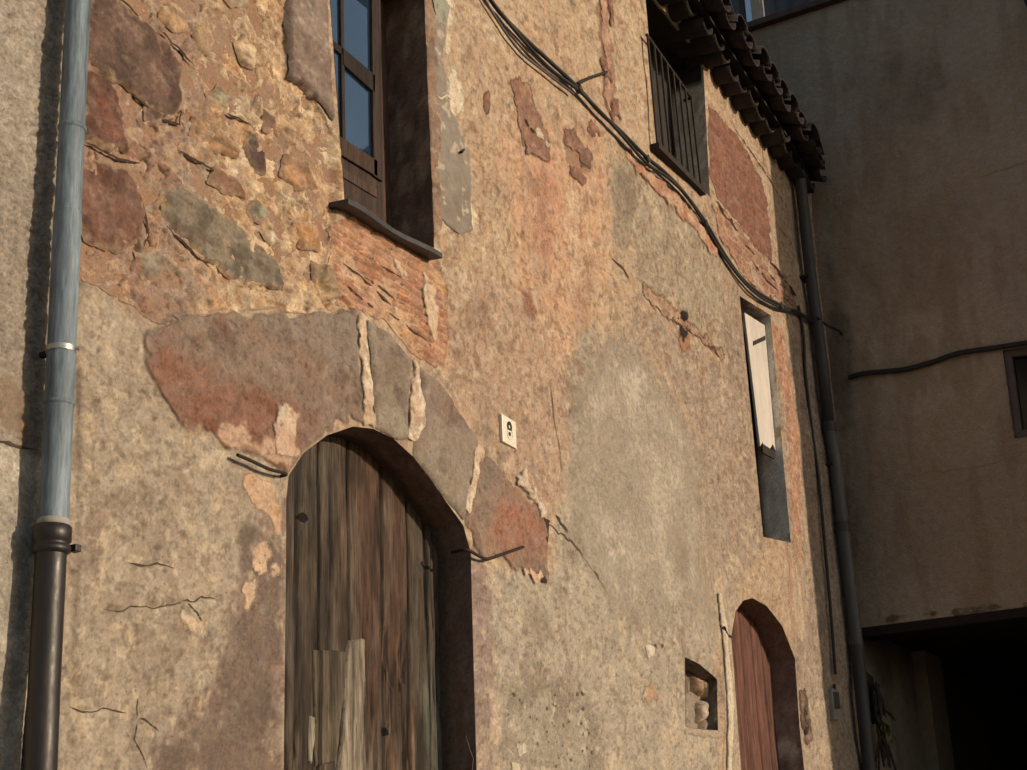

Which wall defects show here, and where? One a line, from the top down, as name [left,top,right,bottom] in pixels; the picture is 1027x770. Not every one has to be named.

peeling [433,0,464,116]
spalling [511,76,601,185]
spalling [80,0,448,368]
spalling [624,108,798,306]
spalling [643,282,725,361]
crack [127,561,173,569]
crack [106,596,215,621]
peeling [242,473,282,610]
peeling [518,468,550,542]
peeling [524,568,547,583]
crack [549,515,605,588]
crack [71,699,158,766]